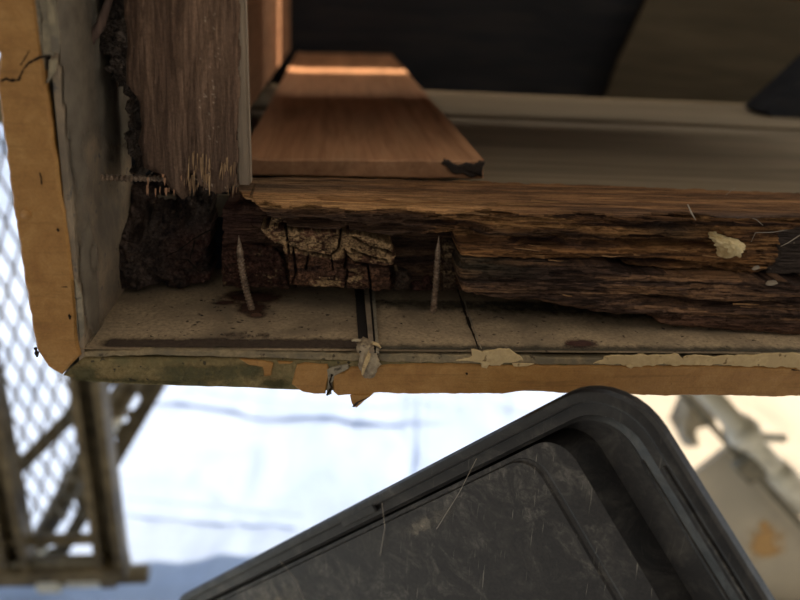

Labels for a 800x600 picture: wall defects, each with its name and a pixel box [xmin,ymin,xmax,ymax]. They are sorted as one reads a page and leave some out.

crack [1,45,52,82]
crack [457,289,482,349]
peeling [240,357,293,376]
spalling [326,364,349,396]
peeling [456,348,534,368]
peeling [593,352,800,371]